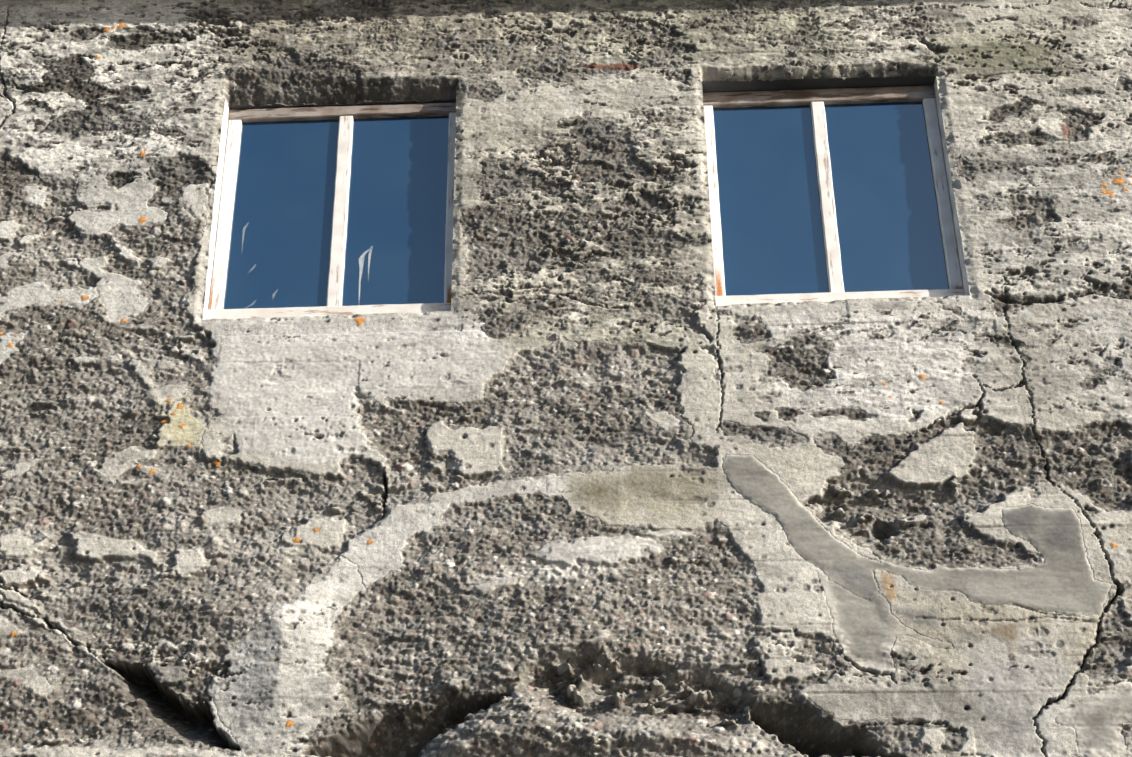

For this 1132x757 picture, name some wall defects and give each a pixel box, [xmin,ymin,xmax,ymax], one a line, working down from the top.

crack [907,0,1130,12]
crack [0,9,47,127]
spalling [21,25,196,133]
spalling [460,117,711,282]
spalling [993,194,1061,231]
spalling [990,263,1132,317]
crack [715,315,724,433]
spalling [0,149,968,757]
spalling [716,402,1132,570]
crack [906,288,1124,757]
crack [0,586,106,661]
spalling [1075,597,1132,680]